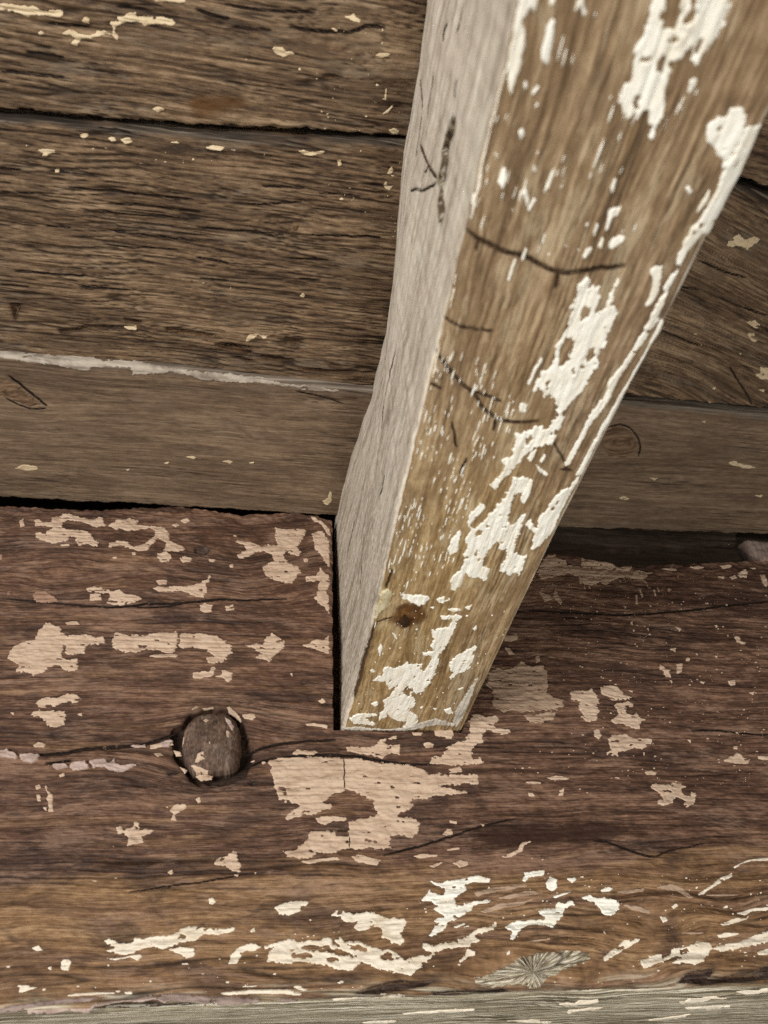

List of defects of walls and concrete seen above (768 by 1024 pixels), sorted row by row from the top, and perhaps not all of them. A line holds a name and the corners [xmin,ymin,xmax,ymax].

peeling [63,12,175,46]
peeling [618,0,731,140]
peeling [470,0,555,220]
peeling [247,107,768,865]
peeling [19,513,215,563]
peeling [229,517,331,614]
rust [391,603,426,626]
peeling [7,621,233,682]
crack [40,732,180,764]
crack [596,840,703,857]
peeling [105,926,235,965]
peeling [219,841,768,1021]